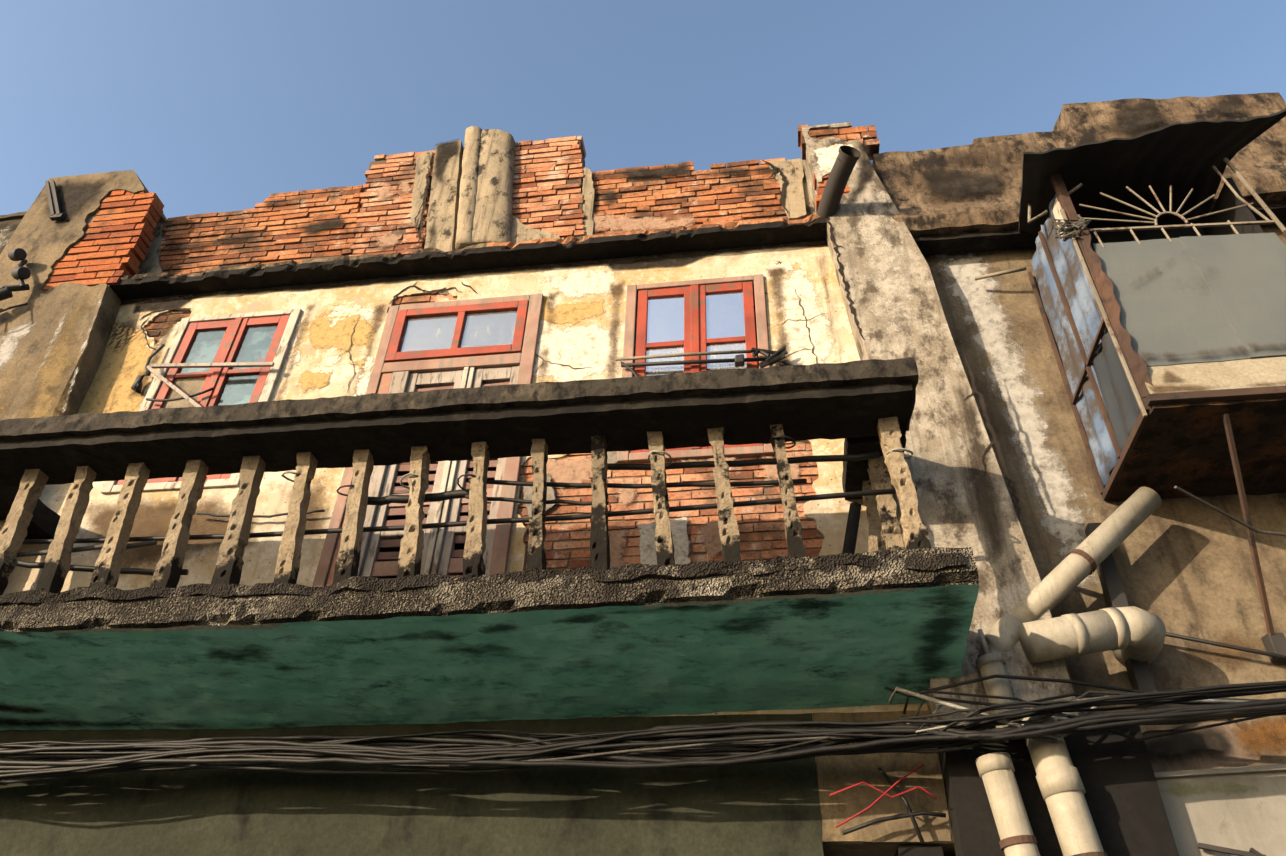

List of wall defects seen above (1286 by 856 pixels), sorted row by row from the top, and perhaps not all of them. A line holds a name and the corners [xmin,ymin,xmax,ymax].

leakage [1111,103,1168,133]
spalling [27,188,164,418]
peeling [78,309,192,414]
peeling [287,292,457,396]
peeling [533,268,621,382]
crack [752,216,865,364]
spalling [517,441,824,570]
leakage [959,389,1004,556]
corrosion [1234,717,1286,753]